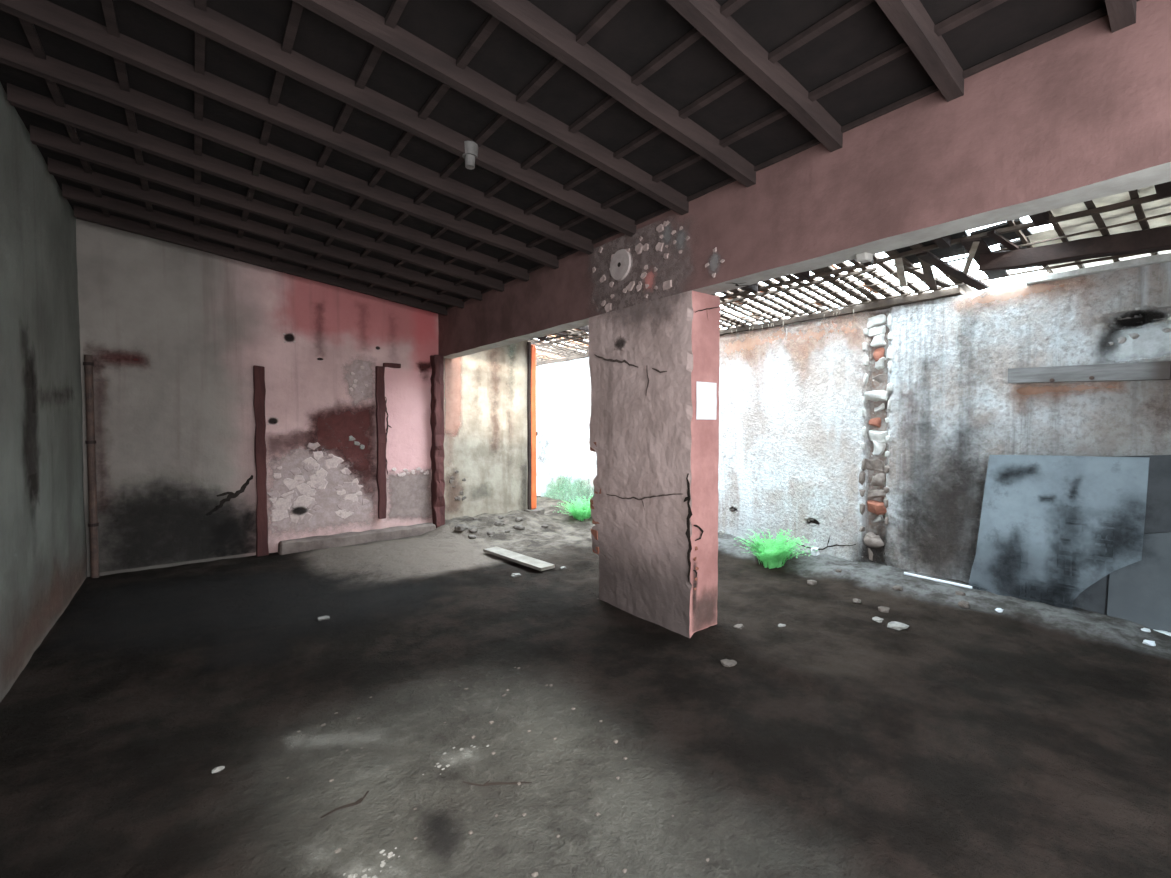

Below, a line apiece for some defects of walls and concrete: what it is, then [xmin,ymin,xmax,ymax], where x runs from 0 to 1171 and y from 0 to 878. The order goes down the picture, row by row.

crack [594,354,667,394]
leakage [1100,319,1143,350]
leakage [107,486,255,571]
crack [214,475,253,511]
flaking render [267,442,373,533]
leakage [271,405,377,493]
flaking render [388,467,432,519]
crack [607,473,704,582]
flaking render [859,312,893,561]
leakage [908,465,985,591]